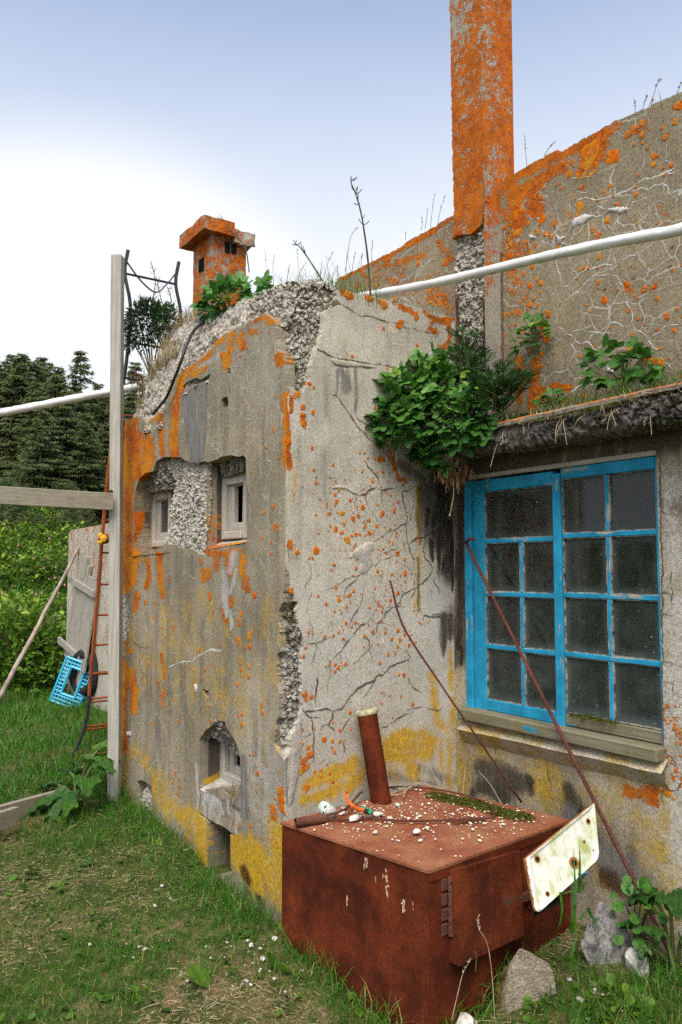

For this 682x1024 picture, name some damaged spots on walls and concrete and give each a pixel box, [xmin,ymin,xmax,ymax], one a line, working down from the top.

spalling [248,281,336,392]
spalling [454,228,486,436]
crack [500,142,682,395]
spalling [144,456,246,556]
crack [210,348,449,764]
damp [417,484,465,666]
spalling [277,599,301,751]
damp [195,754,248,819]